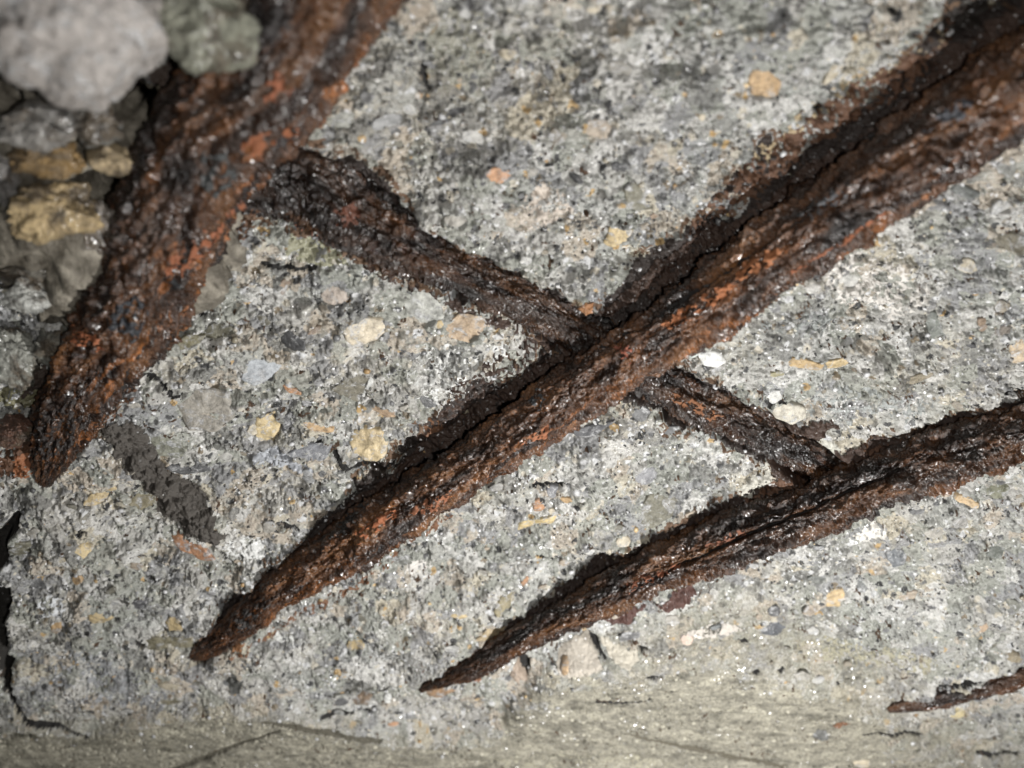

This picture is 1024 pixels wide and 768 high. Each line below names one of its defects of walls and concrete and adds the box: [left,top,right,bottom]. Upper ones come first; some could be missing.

spalling [519,181,573,231]
spalling [824,249,930,321]
spalling [406,341,510,408]
peeling [101,420,265,564]
spalling [252,446,314,474]
spalling [736,459,773,498]
spalling [817,438,841,456]
spalling [855,519,887,545]
spalling [405,559,431,579]
spalling [37,594,66,621]
spalling [274,630,306,647]
rust [886,659,1024,759]